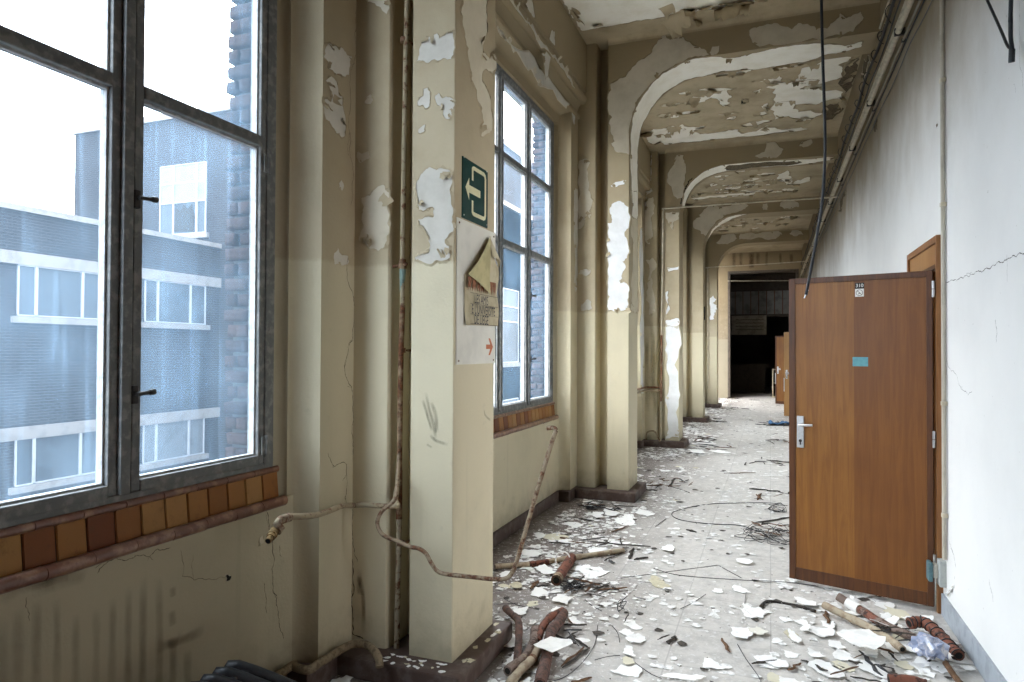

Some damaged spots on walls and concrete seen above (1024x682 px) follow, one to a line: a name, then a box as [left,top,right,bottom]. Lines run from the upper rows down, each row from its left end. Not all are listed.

peeling [321,41,354,140]
peeling [416,0,497,138]
peeling [533,29,575,88]
peeling [358,184,394,252]
peeling [414,165,457,267]
peeling [561,0,871,439]
crack [946,253,1024,283]